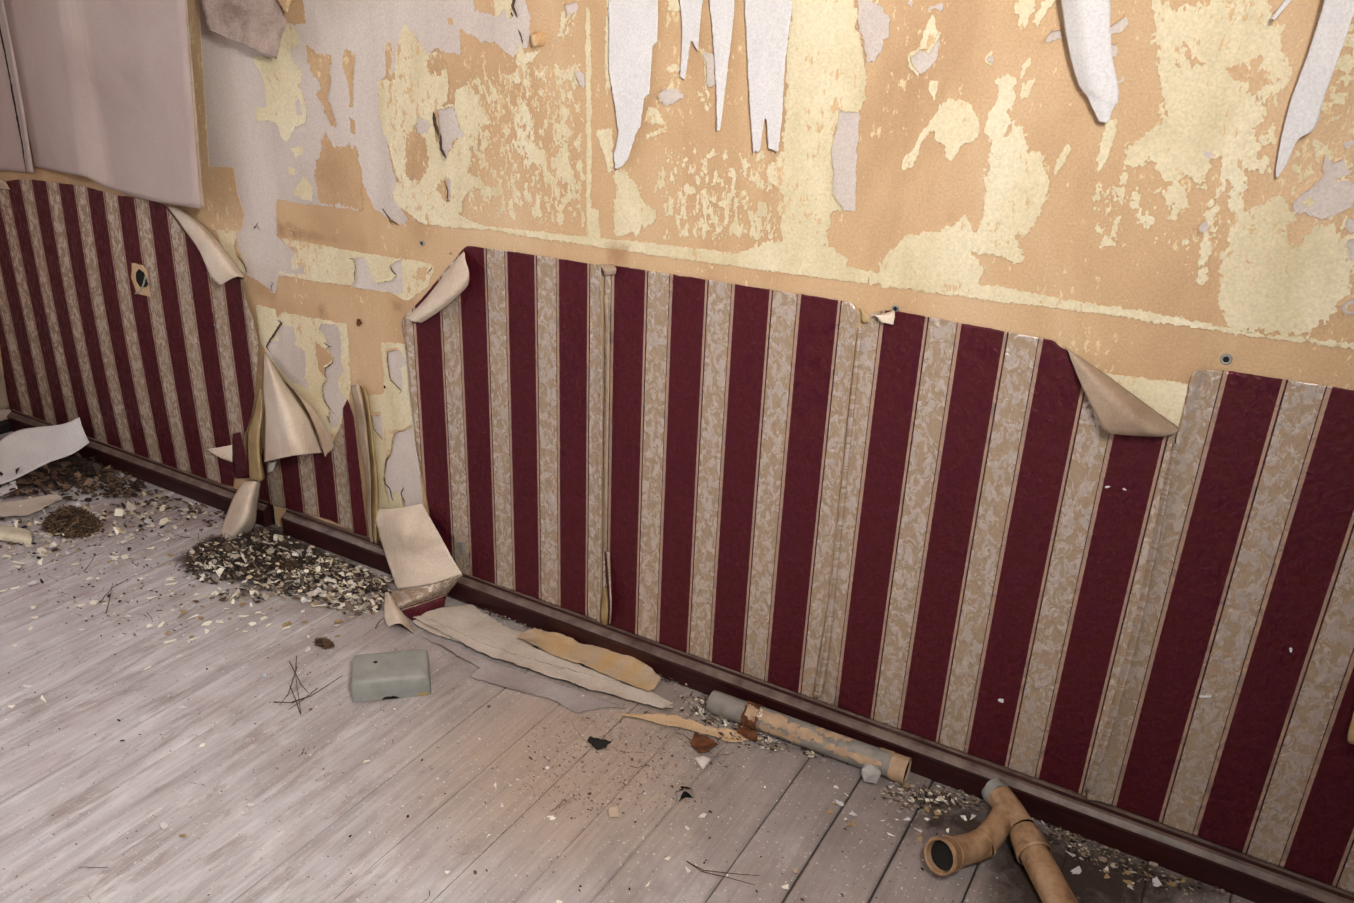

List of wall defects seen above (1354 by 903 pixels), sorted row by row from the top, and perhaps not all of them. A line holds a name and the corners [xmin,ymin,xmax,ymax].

peeling [167,0,1354,544]